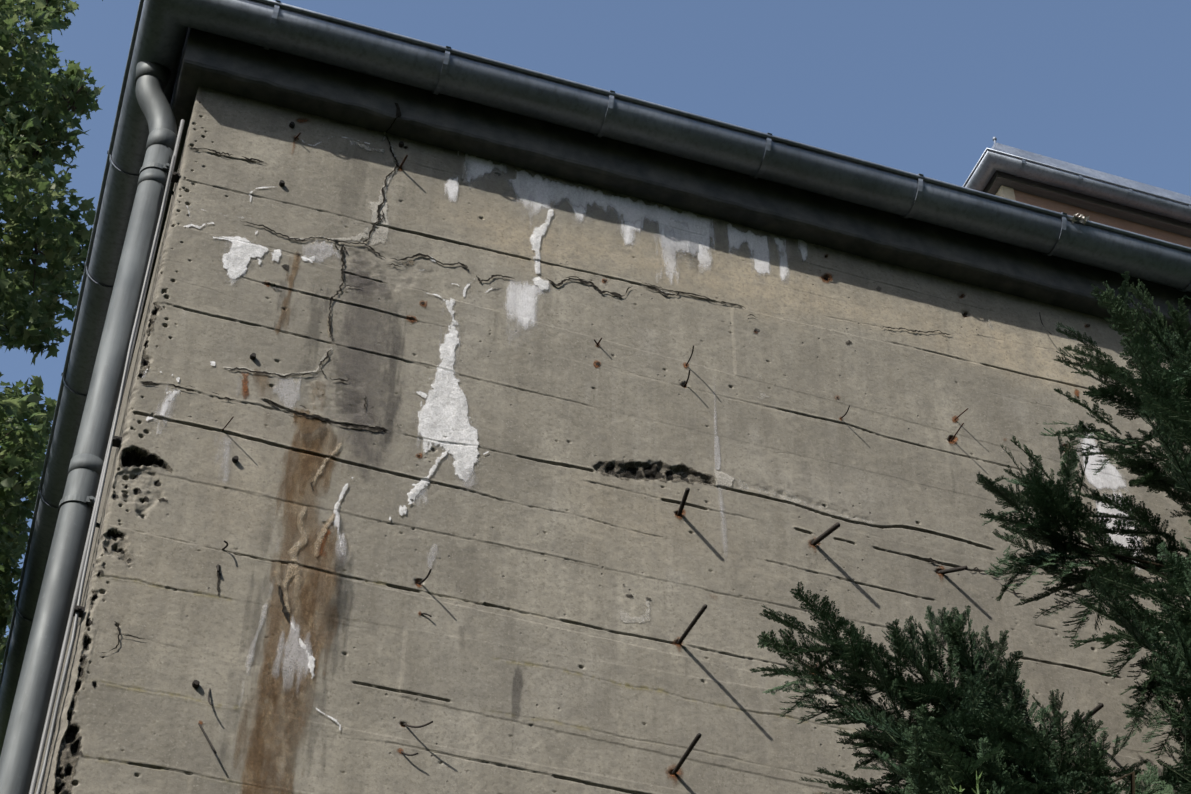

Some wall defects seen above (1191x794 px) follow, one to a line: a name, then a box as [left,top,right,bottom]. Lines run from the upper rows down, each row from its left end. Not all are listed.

crack [142,102,512,431]
crack [548,276,757,319]
spalling [112,445,172,503]
spalling [593,459,716,486]
crack [278,583,289,621]
rust [242,411,338,794]
spalling [53,530,131,794]